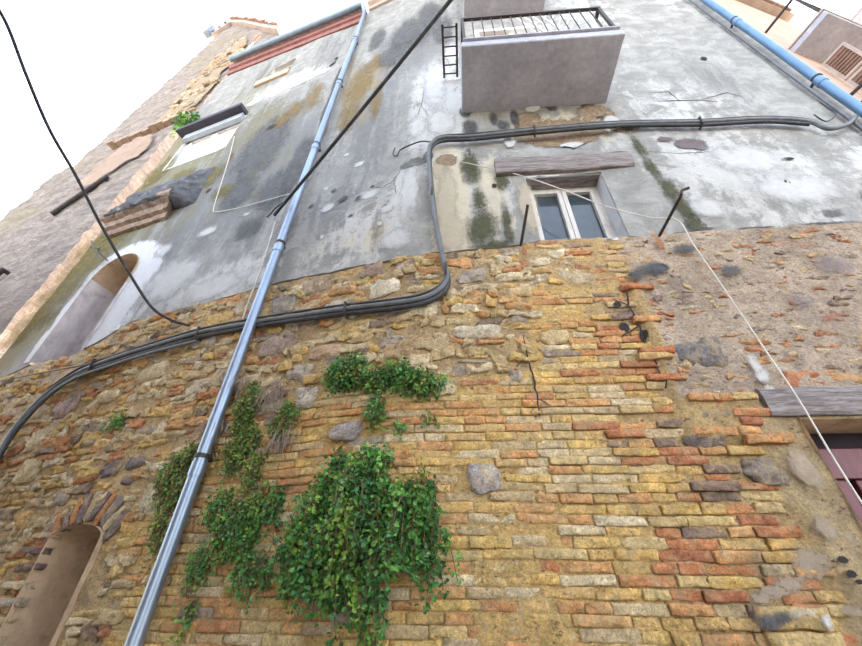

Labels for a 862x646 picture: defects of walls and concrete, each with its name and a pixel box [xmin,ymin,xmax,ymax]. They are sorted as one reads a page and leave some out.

leakage [370,30,386,50]
spalling [155,37,248,123]
leakage [314,67,341,123]
crack [652,91,744,102]
spalling [504,105,638,148]
leakage [212,121,314,239]
leakage [359,189,380,199]
leakage [495,176,510,189]
leakage [467,204,514,248]
leakage [143,244,266,302]